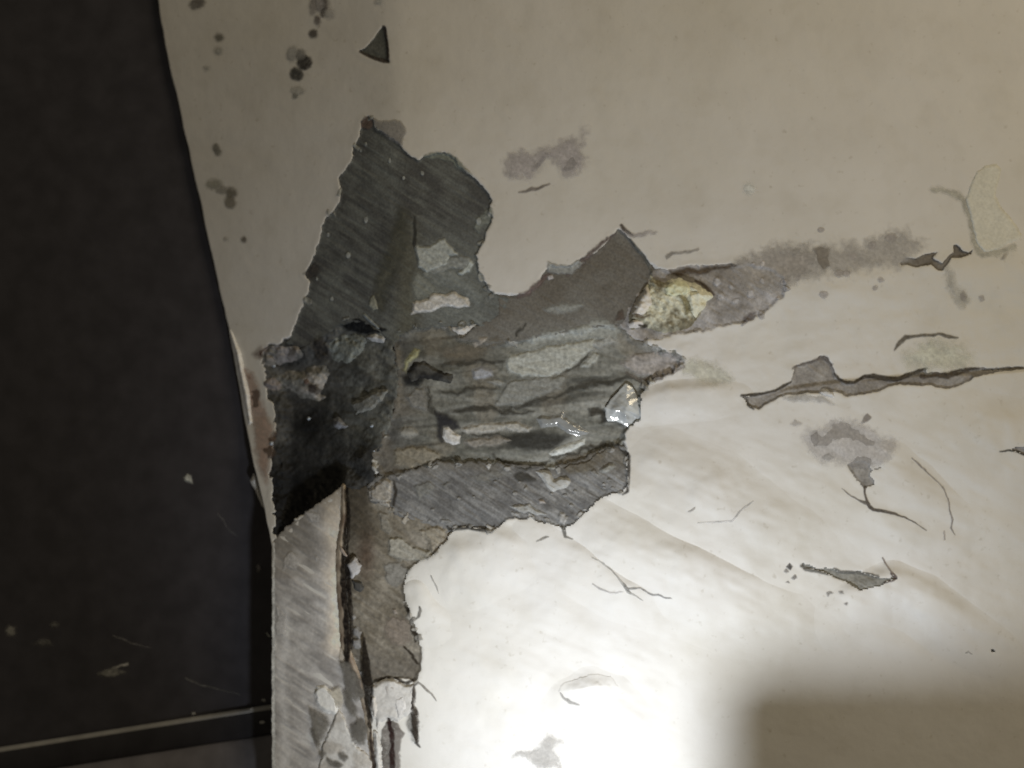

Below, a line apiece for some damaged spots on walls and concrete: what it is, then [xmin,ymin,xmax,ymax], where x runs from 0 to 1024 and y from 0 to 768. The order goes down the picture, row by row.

flaking render [359,26,389,63]
mould [287,48,312,98]
water stain [505,139,583,193]
flaking render [900,245,973,271]
flaking render [251,116,790,768]
crack [844,458,955,540]
flaking render [785,557,898,605]